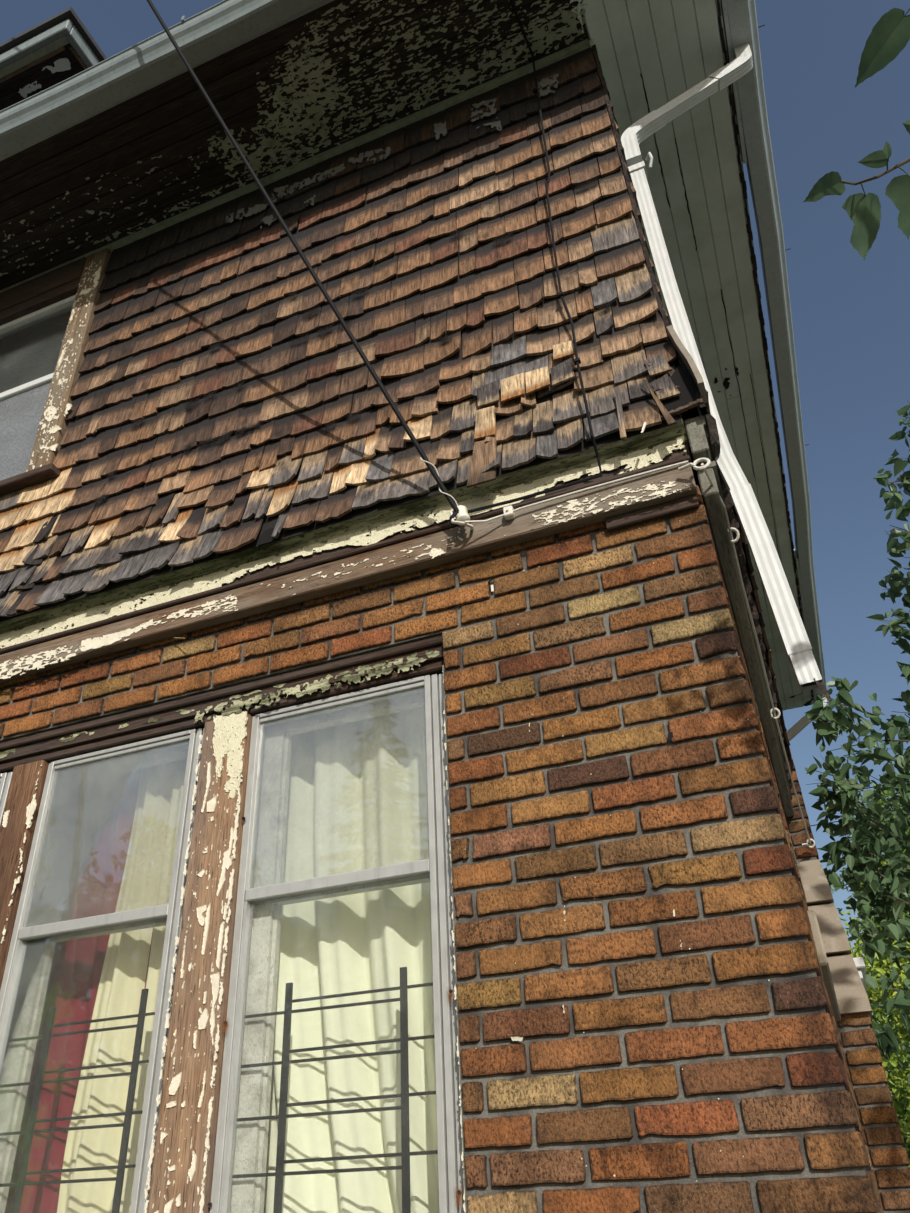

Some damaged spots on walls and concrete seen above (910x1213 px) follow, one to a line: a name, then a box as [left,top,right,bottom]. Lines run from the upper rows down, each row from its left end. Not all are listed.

peeling [0,0,587,276]
peeling [26,260,102,472]
peeling [0,438,691,679]
peeling [11,799,37,895]
peeling [59,731,94,743]
peeling [152,650,439,1213]